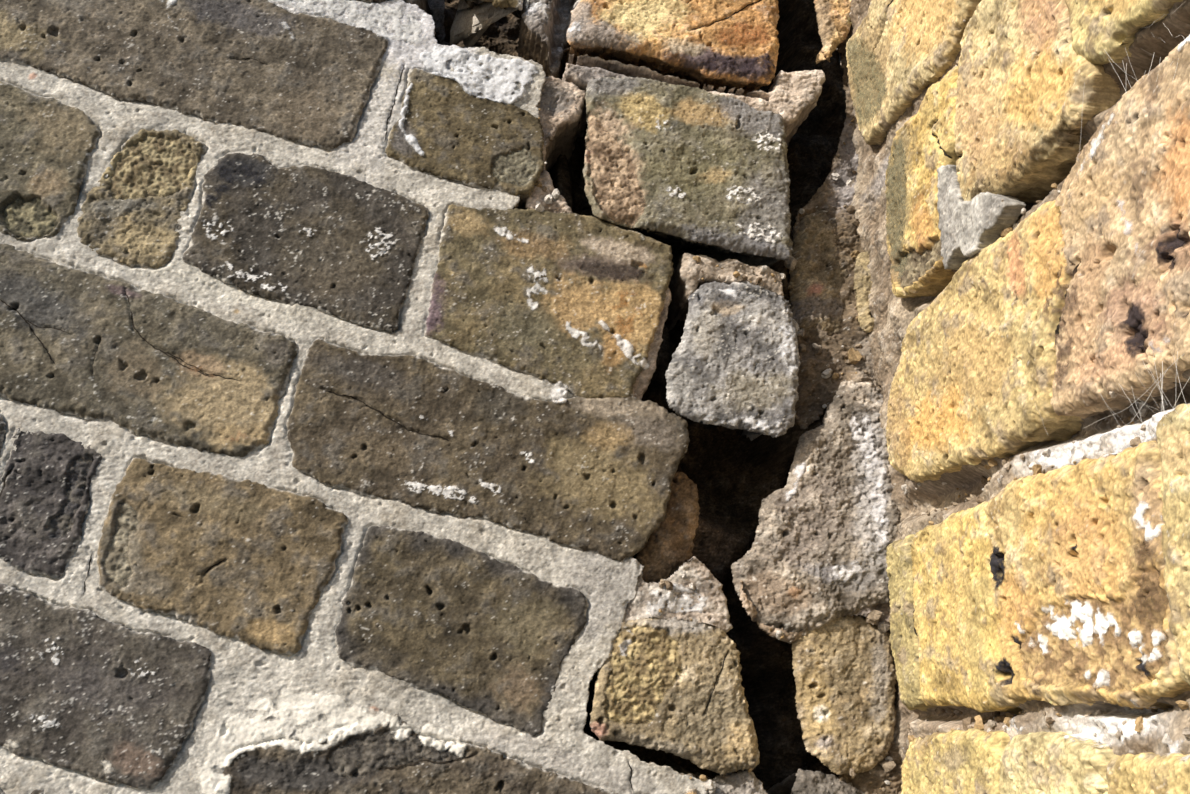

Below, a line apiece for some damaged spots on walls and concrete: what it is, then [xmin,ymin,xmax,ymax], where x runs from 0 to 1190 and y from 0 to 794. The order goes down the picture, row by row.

crack [403,0,492,52]
crack [549,124,588,215]
crack [690,0,846,301]
crack [1,300,71,365]
crack [125,291,239,381]
crack [322,389,449,441]
water stain [1133,502,1162,540]
crack [583,320,839,793]
water stain [1016,600,1163,664]
water stain [1085,670,1110,686]
spalling [329,730,468,779]